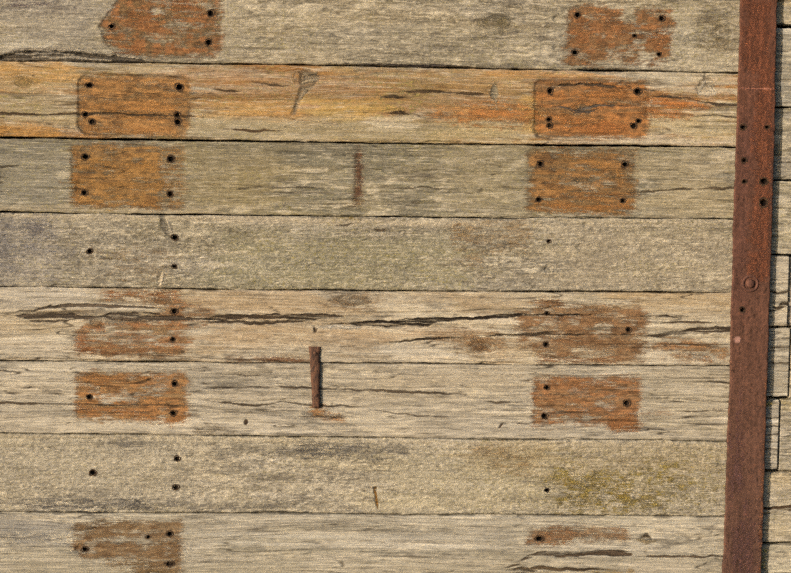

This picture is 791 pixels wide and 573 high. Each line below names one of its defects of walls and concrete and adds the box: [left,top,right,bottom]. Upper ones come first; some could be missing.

rust [100,0,224,59]
rust [563,3,676,68]
rust [70,73,192,211]
rust [427,79,709,216]
rust [740,1,775,282]
crack [16,304,584,343]
rust [514,300,729,365]
crack [612,315,731,337]
rust [74,371,190,424]
rust [530,374,642,432]
crack [506,550,723,573]